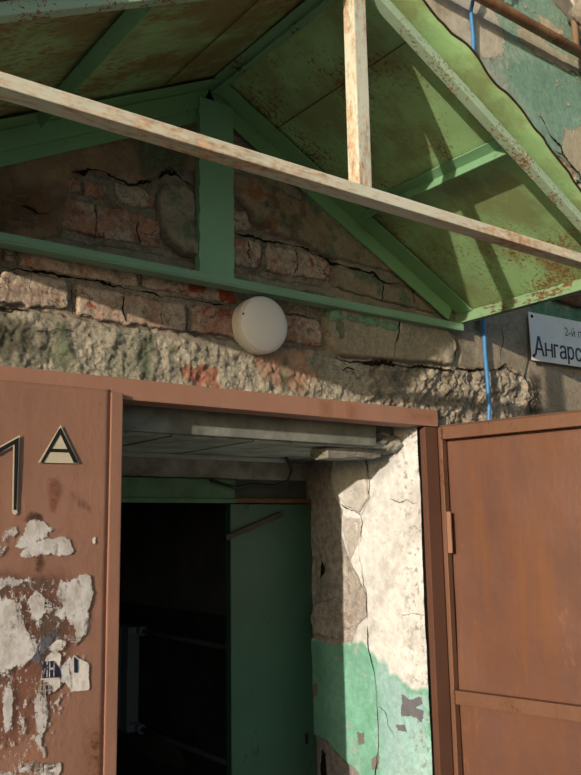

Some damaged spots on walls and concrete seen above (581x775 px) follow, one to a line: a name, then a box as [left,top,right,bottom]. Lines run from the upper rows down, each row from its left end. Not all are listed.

peeling [426,0,581,104]
crack [539,116,581,183]
peeling [558,124,581,188]
crack [0,305,25,313]
crack [452,326,531,396]
flaking render [306,459,369,646]
crack [341,460,395,775]
peeling [396,695,424,732]
spalling [316,736,359,775]